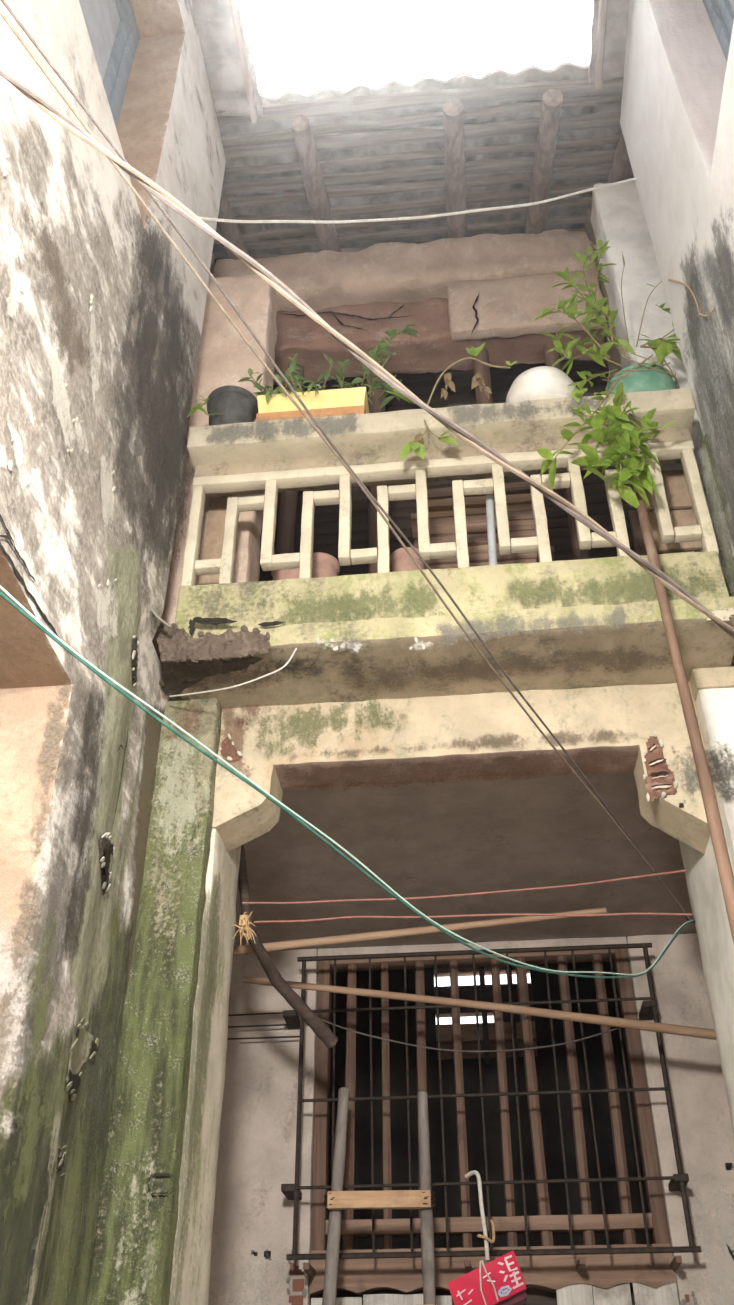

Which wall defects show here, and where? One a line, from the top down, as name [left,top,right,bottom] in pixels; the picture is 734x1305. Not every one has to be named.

leakage [24,202,90,375]
crack [277,305,412,331]
crack [470,295,479,336]
leakage [257,371,734,759]
peeling [95,578,140,686]
spalling [151,609,271,699]
spalling [643,731,686,807]
spalling [98,832,115,896]
leakage [123,705,209,1019]
leakage [0,680,105,1305]
spalling [66,1017,99,1101]
leakage [120,875,221,1305]